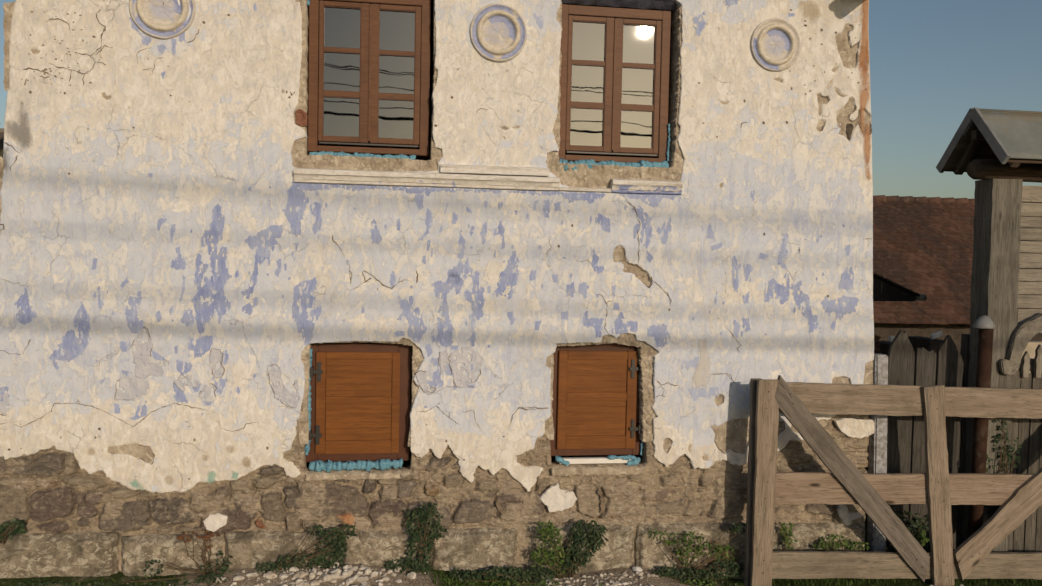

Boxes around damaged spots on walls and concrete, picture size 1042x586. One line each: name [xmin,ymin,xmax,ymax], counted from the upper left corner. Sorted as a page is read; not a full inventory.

spalling [3,1,16,91]
crack [21,8,110,93]
spalling [774,9,872,141]
corrosion [859,0,870,179]
crack [332,235,418,291]
spalling [49,0,706,453]
peeling [731,233,859,333]
peeling [720,318,751,338]
crack [3,400,257,432]
spalling [107,443,155,465]
peeling [688,386,725,406]
spalling [688,418,750,461]